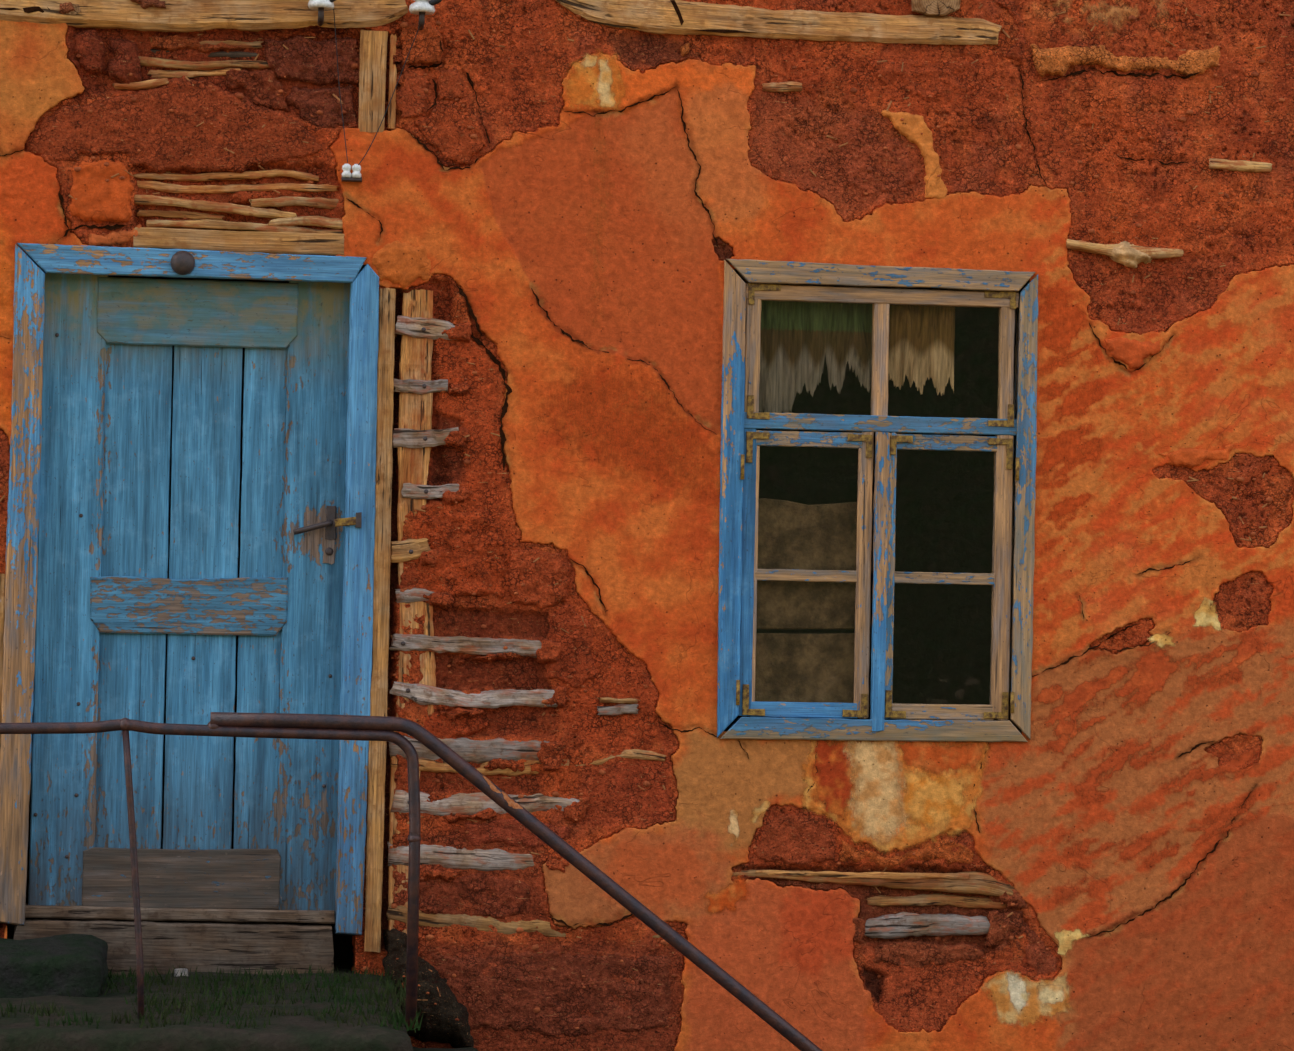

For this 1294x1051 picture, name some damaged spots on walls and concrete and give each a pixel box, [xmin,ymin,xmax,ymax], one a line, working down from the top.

spalling [355,273,688,1051]